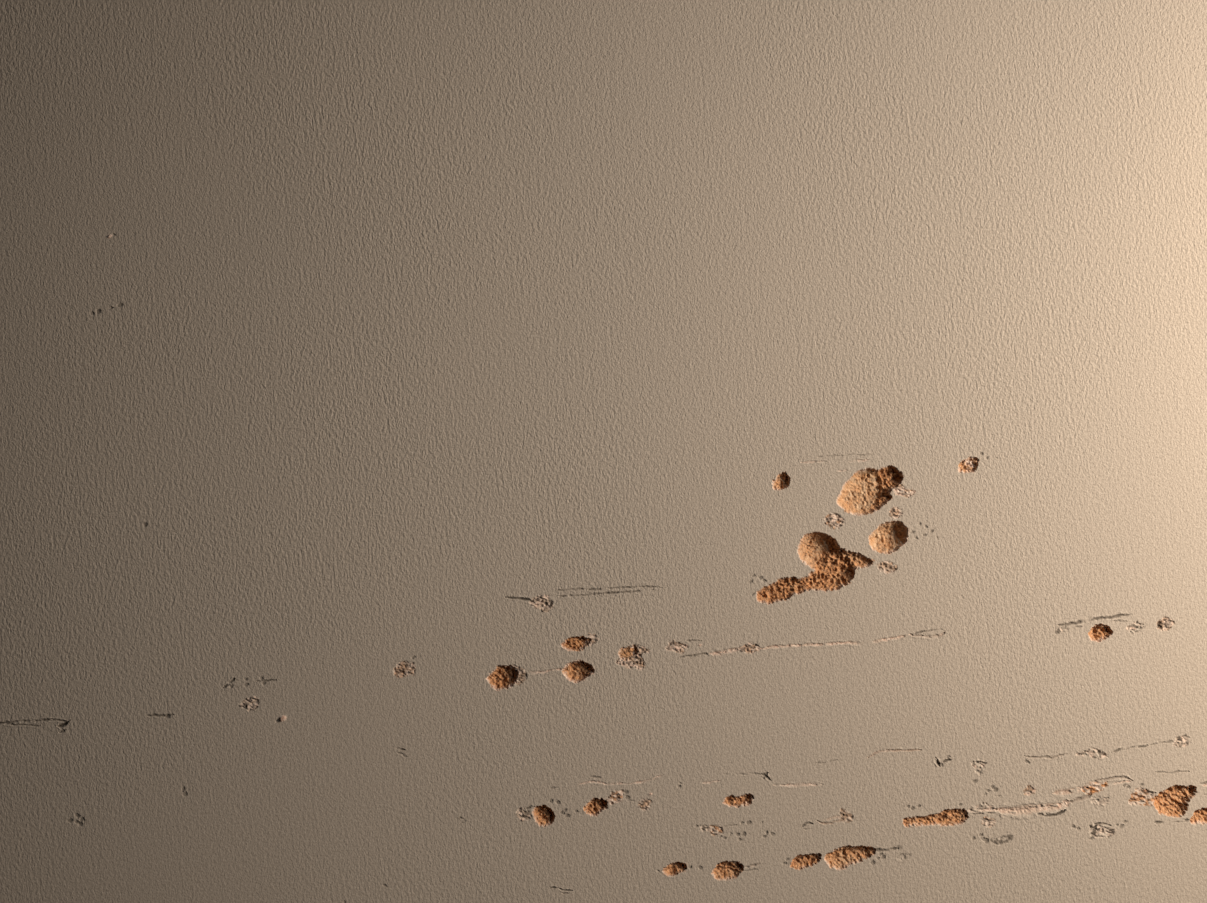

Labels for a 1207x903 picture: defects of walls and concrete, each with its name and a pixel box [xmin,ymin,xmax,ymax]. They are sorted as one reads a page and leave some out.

flaking render [748,463,917,605]
flaking render [1088,616,1176,644]
flaking render [561,633,600,684]
flaking render [486,664,528,692]
flaking render [515,789,654,828]
flaking render [902,803,970,828]
flaking render [1128,770,1207,826]
flaking render [657,860,764,882]
flaking render [782,845,912,871]